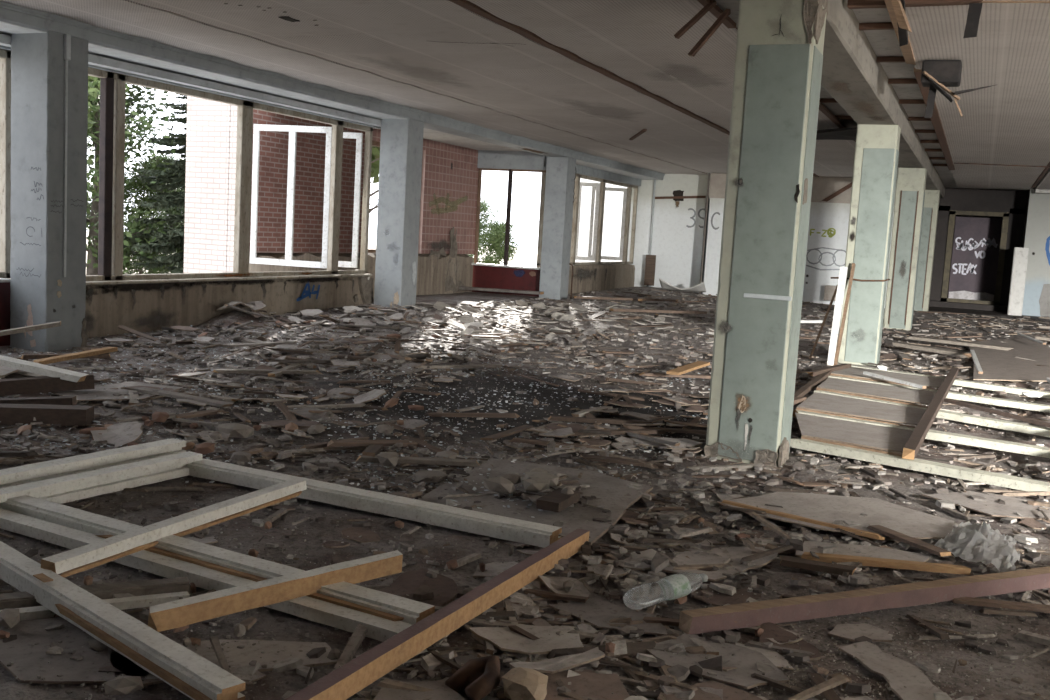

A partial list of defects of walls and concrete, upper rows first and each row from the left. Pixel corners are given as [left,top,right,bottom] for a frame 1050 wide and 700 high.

spalling [803,0,828,44]